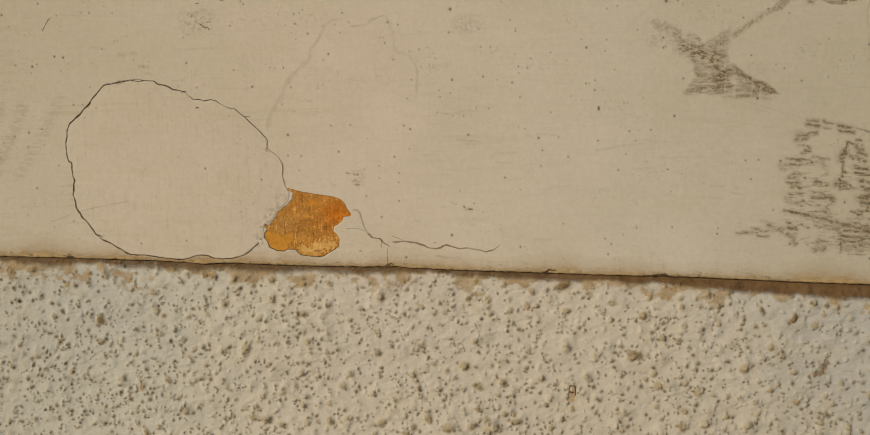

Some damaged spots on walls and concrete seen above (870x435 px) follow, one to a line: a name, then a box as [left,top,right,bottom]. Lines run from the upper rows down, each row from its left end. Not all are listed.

crack [65,79,286,260]
peeling [257,188,351,257]
crack [347,228,497,264]